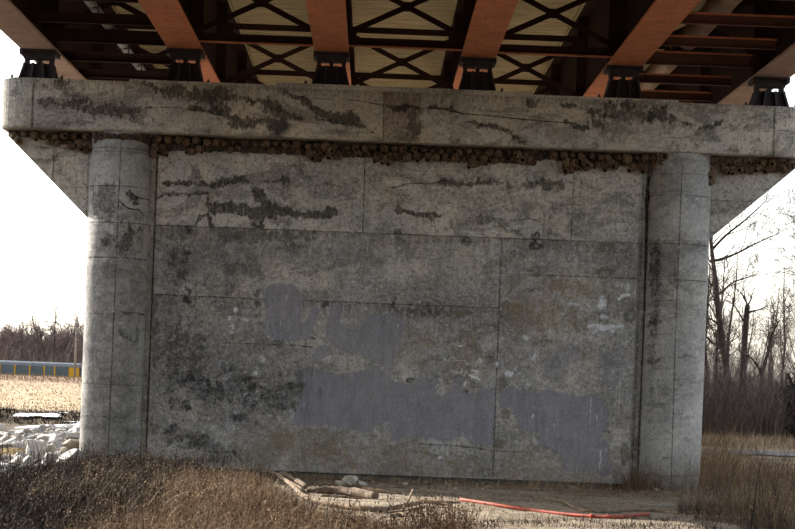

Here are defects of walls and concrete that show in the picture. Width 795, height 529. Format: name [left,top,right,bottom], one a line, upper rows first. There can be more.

damp [32,76,147,125]
damp [134,80,373,137]
damp [465,120,526,145]
crack [422,104,590,132]
damp [587,99,725,136]
crack [120,189,149,212]
damp [157,163,346,252]
damp [395,205,442,221]
damp [476,176,565,193]
peeling [558,295,624,339]
damp [153,371,241,467]